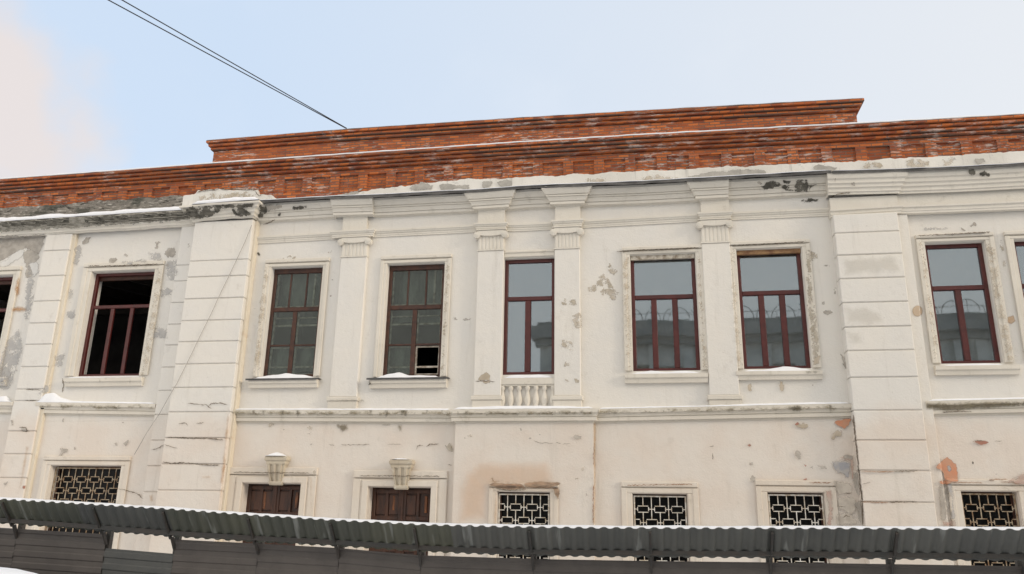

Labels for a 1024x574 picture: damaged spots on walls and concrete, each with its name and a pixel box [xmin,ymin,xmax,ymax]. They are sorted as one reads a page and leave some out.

flaking render [688,169,819,202]
peeling [0,234,44,318]
peeling [109,242,177,374]
peeling [588,264,619,300]
peeling [0,331,22,389]
crack [153,402,306,474]
flaking render [795,451,862,525]
flaking render [831,418,851,440]
crack [852,417,913,525]
flaking render [936,457,959,526]